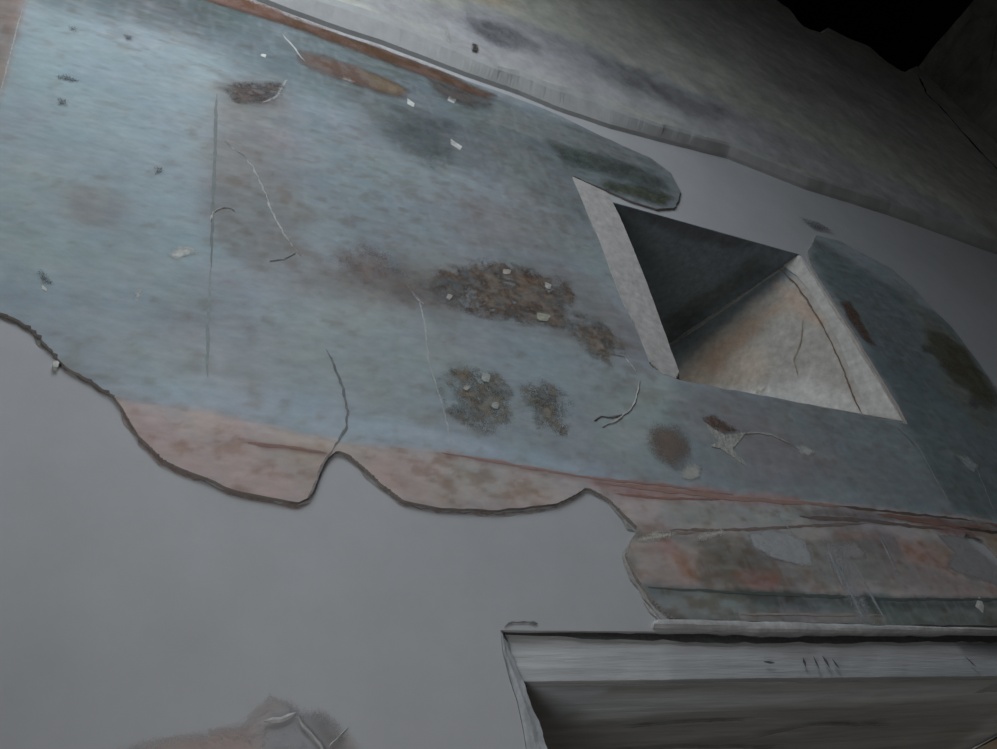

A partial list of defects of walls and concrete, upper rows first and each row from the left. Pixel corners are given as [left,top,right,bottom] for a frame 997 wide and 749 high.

spalling [223,81,286,105]
crack [226,142,301,261]
spalling [425,253,631,365]
crack [670,266,862,413]
spalling [432,363,576,437]
spalling [701,413,737,435]
crack [0,316,997,644]
peeling [747,528,815,567]
crack [264,712,348,749]